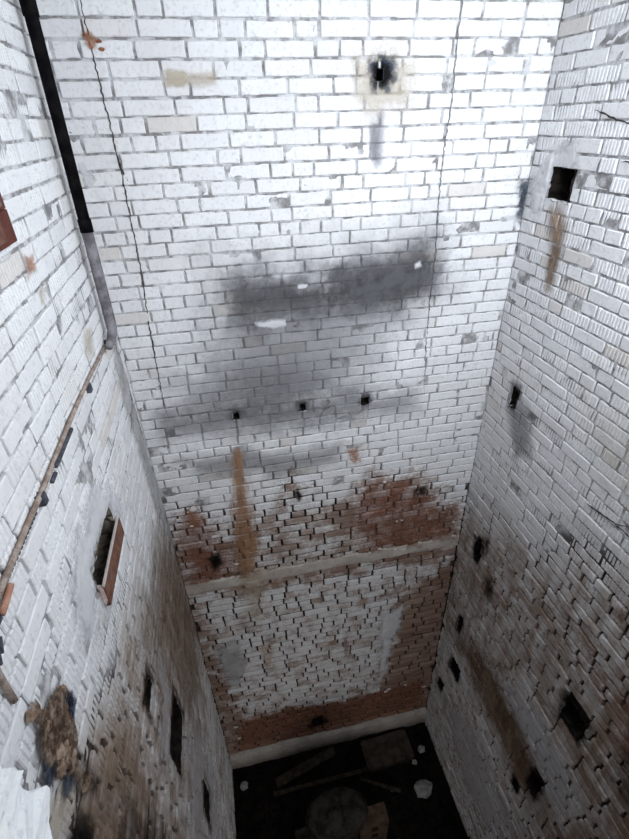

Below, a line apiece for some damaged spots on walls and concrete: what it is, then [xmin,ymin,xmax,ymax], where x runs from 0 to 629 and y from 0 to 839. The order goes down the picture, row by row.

crack [596,110,629,124]
crack [80,0,169,420]
crack [424,0,463,392]
corrosion [546,209,564,290]
spalling [26,683,98,797]